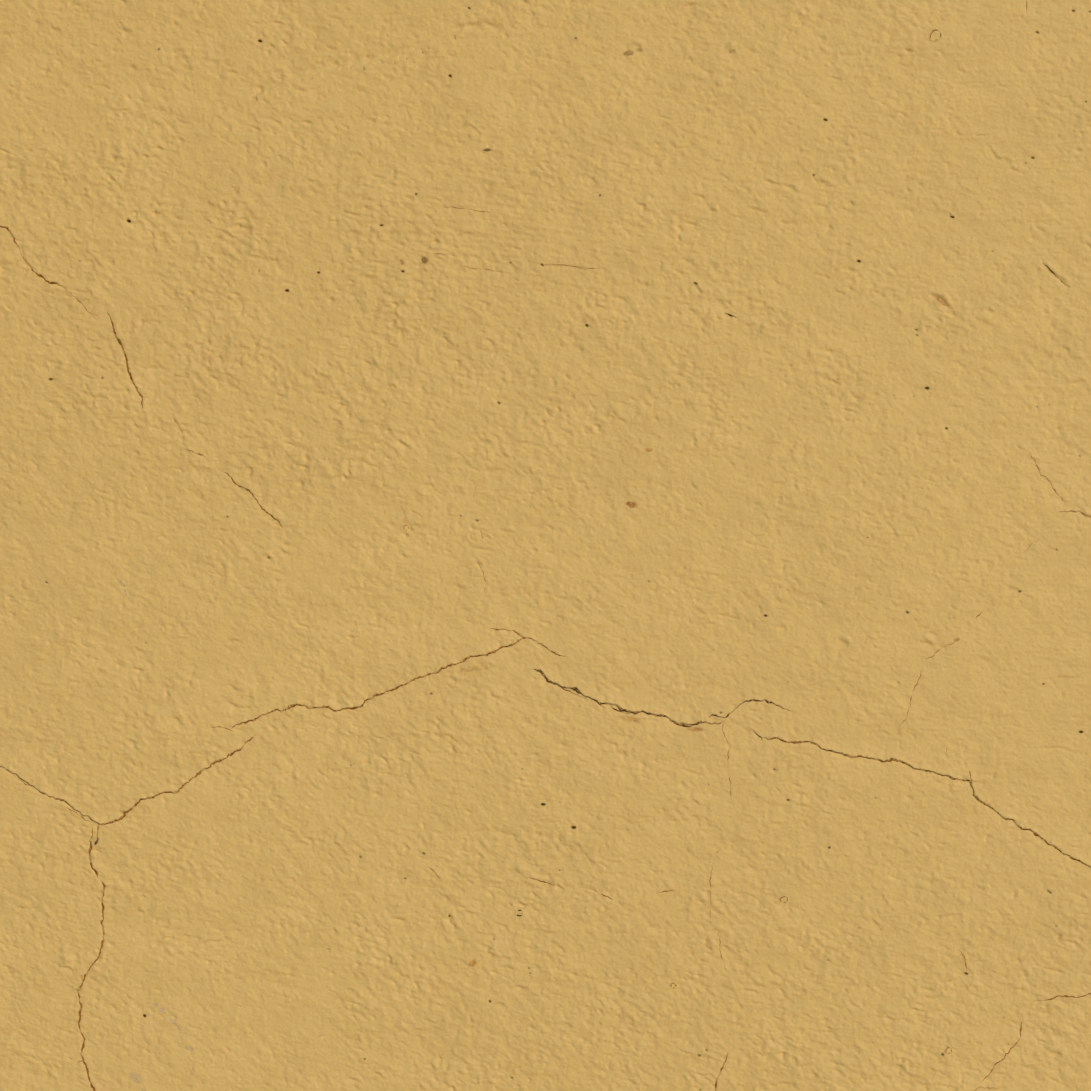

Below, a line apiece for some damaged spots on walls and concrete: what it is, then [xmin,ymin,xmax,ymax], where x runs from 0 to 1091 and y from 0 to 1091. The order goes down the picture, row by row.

crack [0,226,143,409]
crack [187,449,282,527]
crack [0,628,784,1091]
crack [755,732,1086,865]
crack [975,993,1091,1091]